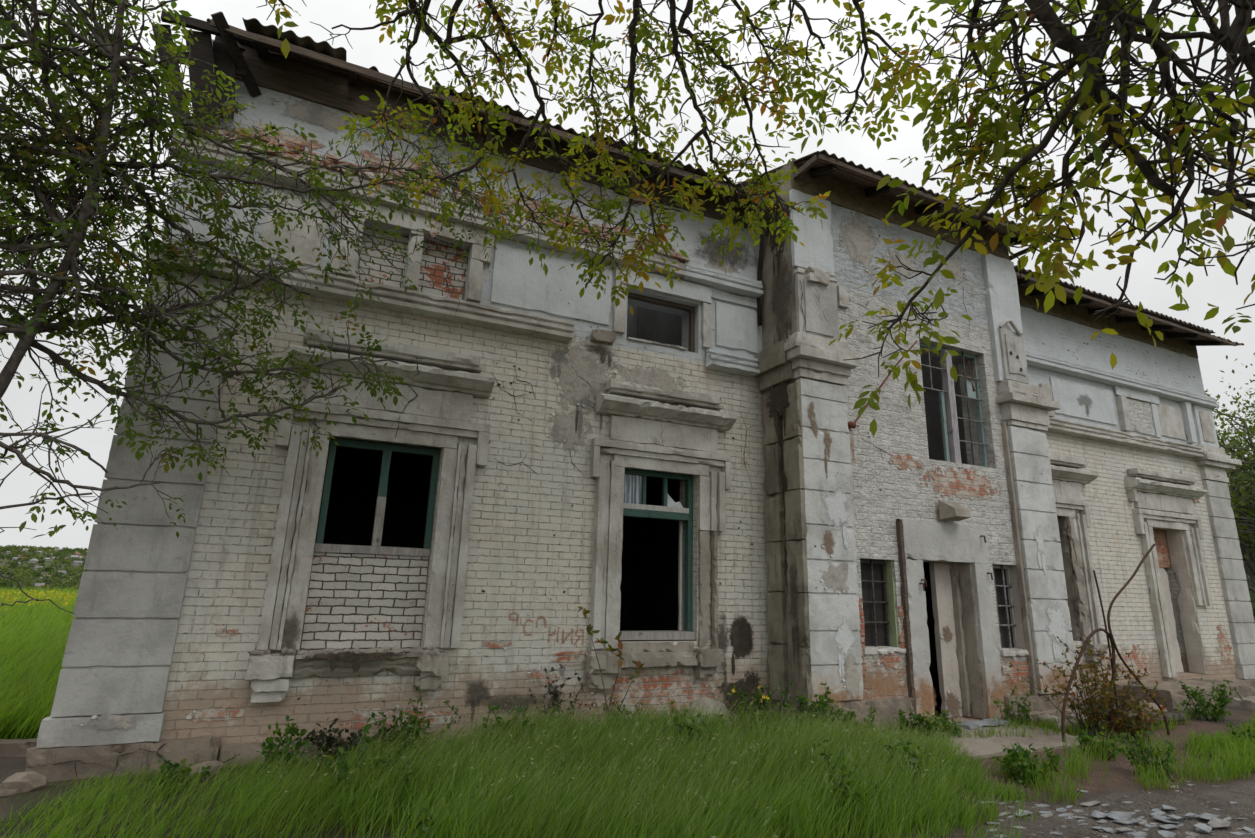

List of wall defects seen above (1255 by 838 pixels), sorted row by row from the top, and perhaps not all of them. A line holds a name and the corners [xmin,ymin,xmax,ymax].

spalling [884,452,1001,500]
spalling [524,650,586,685]
leakage [717,615,767,717]
spalling [874,653,904,670]